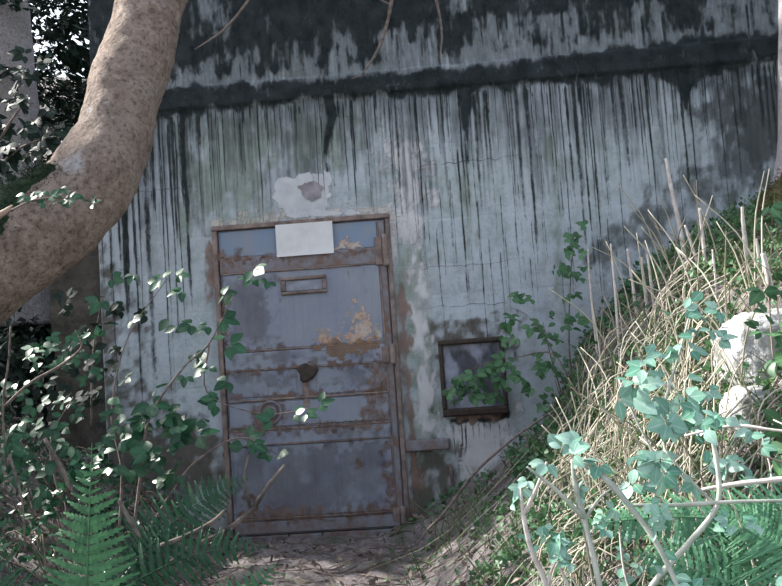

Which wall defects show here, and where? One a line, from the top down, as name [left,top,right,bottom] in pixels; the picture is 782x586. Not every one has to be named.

leakage [87,0,115,68]
peeling [272,169,361,220]
leakage [102,0,779,484]
rust [397,286,415,440]